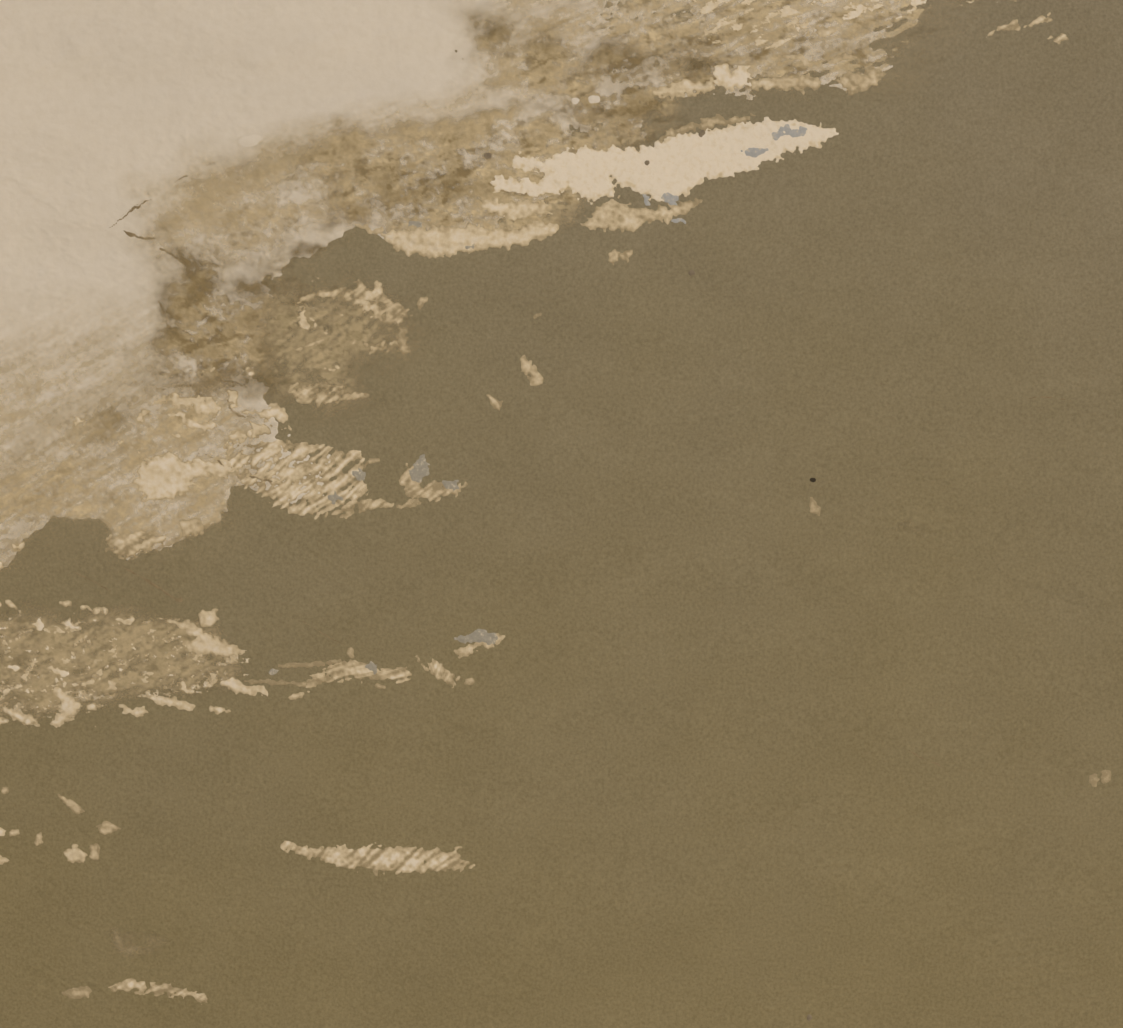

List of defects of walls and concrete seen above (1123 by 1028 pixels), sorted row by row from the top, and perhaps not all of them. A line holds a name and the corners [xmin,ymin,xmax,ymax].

peeling [652,53,821,101]
peeling [355,113,839,259]
peeling [294,277,428,355]
peeling [520,355,543,386]
peeling [117,364,468,520]
peeling [165,608,475,700]
peeling [454,629,505,659]
peeling [0,666,117,728]
peeling [118,680,195,717]
peeling [63,821,121,863]
peeling [280,841,475,876]
peeling [108,978,208,1005]